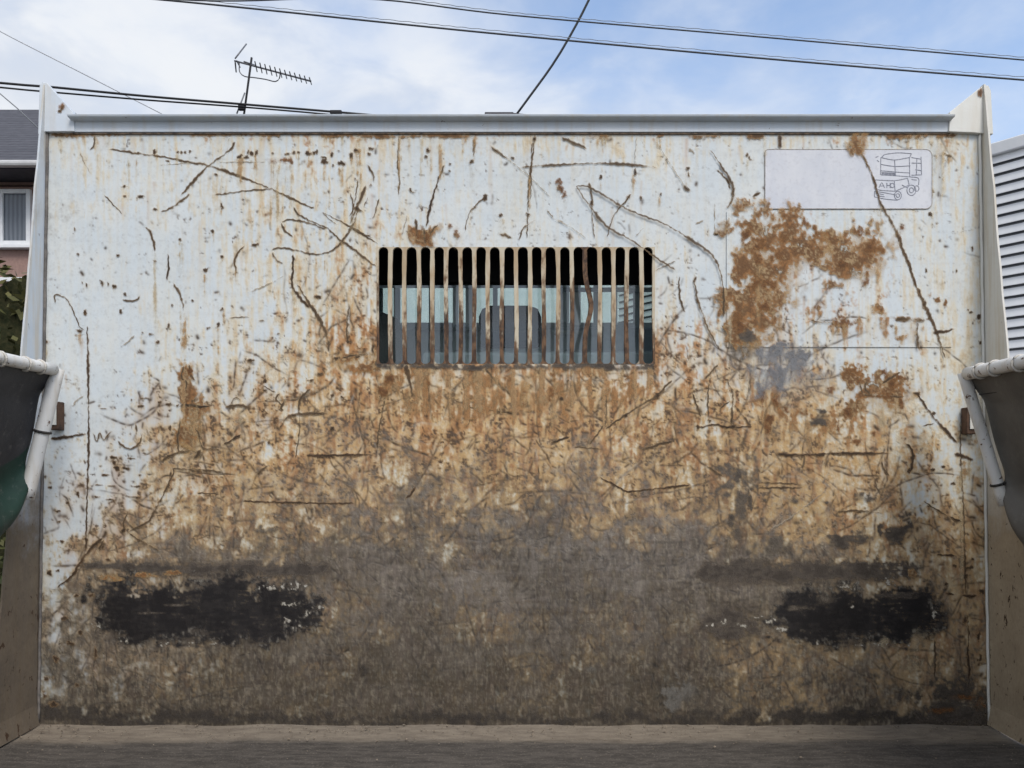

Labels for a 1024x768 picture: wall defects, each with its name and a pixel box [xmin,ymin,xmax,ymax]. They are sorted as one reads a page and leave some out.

rust [408,219,459,247]
rust [710,198,904,350]
rust [131,362,210,452]
rust [333,309,653,428]
rust [754,362,917,448]
rust [808,303,925,349]
rust [94,456,141,500]